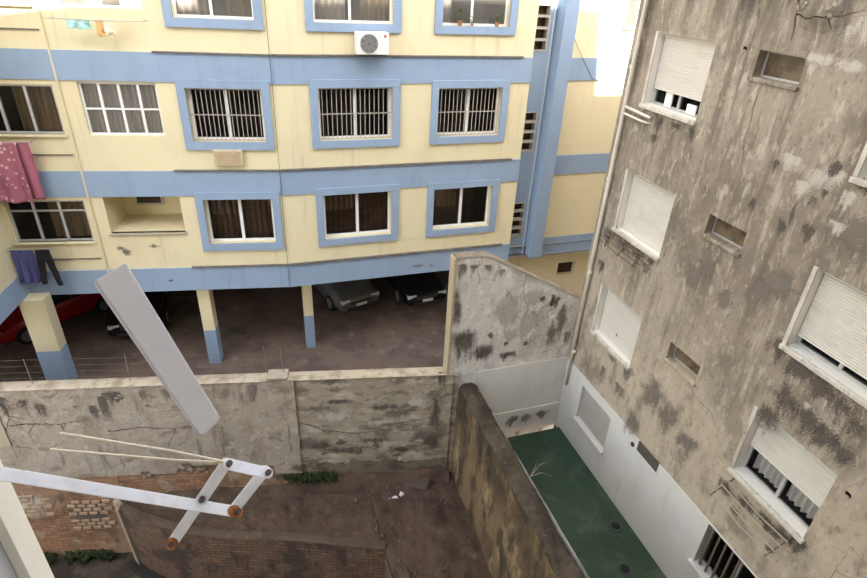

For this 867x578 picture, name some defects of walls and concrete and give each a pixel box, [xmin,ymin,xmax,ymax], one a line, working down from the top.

crack [791,0,865,39]
leakage [797,0,867,83]
leakage [770,152,867,275]
leakage [450,263,570,364]
leakage [0,397,49,420]
leakage [89,392,119,422]
leakage [246,384,256,400]
leakage [273,372,454,480]
leakage [505,409,552,428]
leakage [600,354,703,461]
leakage [754,335,867,473]
spalling [17,491,117,532]